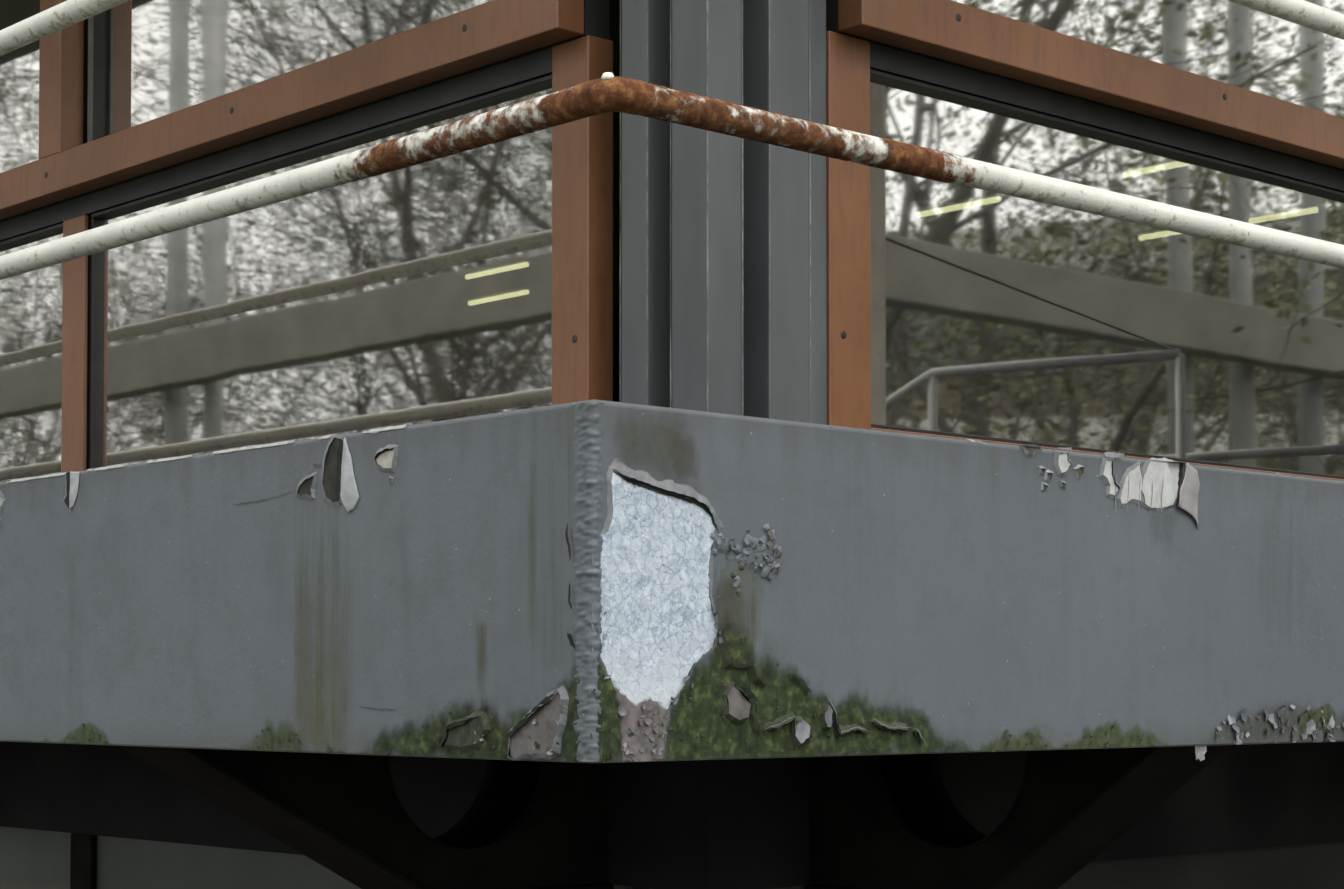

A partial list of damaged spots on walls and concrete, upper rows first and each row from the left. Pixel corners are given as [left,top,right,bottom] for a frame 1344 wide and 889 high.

corrosion [335,76,982,189]
peeling [0,464,126,525]
peeling [146,440,295,463]
peeling [296,434,360,513]
peeling [363,424,409,485]
peeling [1020,444,1200,525]
peeling [591,457,724,762]
peeling [440,685,569,762]
peeling [1195,704,1344,761]